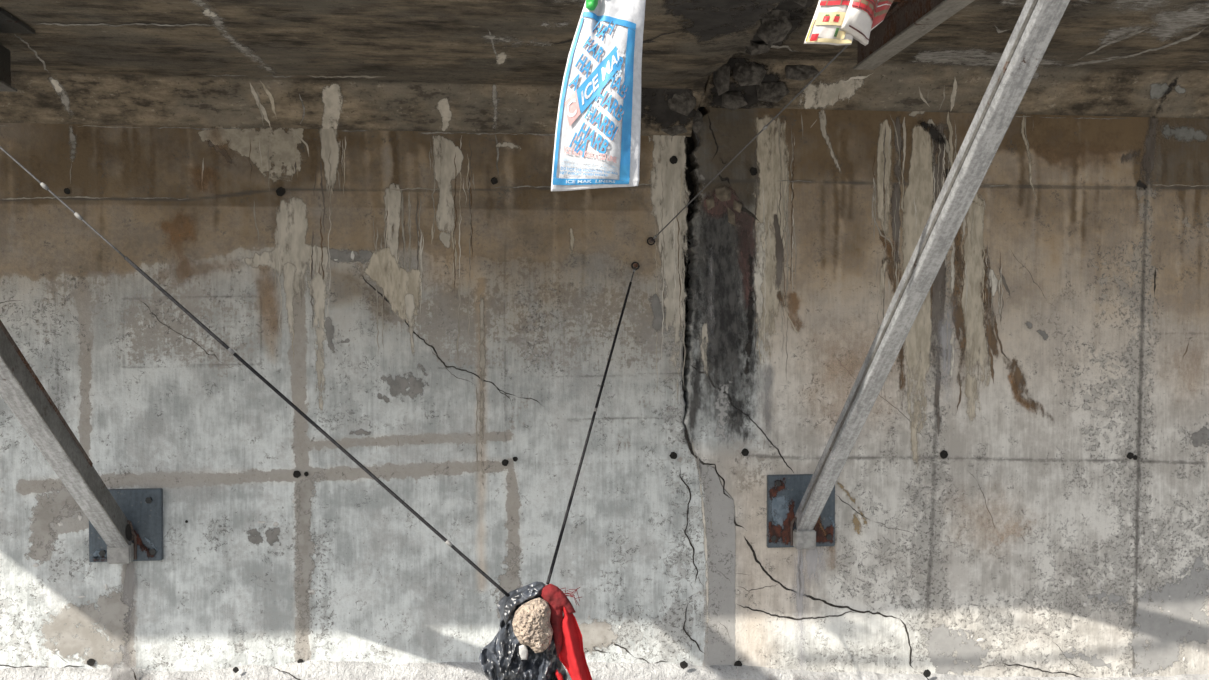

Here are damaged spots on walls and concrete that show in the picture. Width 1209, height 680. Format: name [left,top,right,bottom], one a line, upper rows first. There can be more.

water stain [364,85,555,474]
spalling [641,0,821,136]
crack [682,63,794,473]
water stain [638,73,873,629]
water stain [872,49,1002,331]
water stain [881,185,1051,462]
corrosion [767,478,795,545]
crack [679,424,929,680]
corrosion [816,516,835,543]
crack [982,643,1080,677]
peeling [1060,647,1111,669]
peeling [1083,545,1209,677]